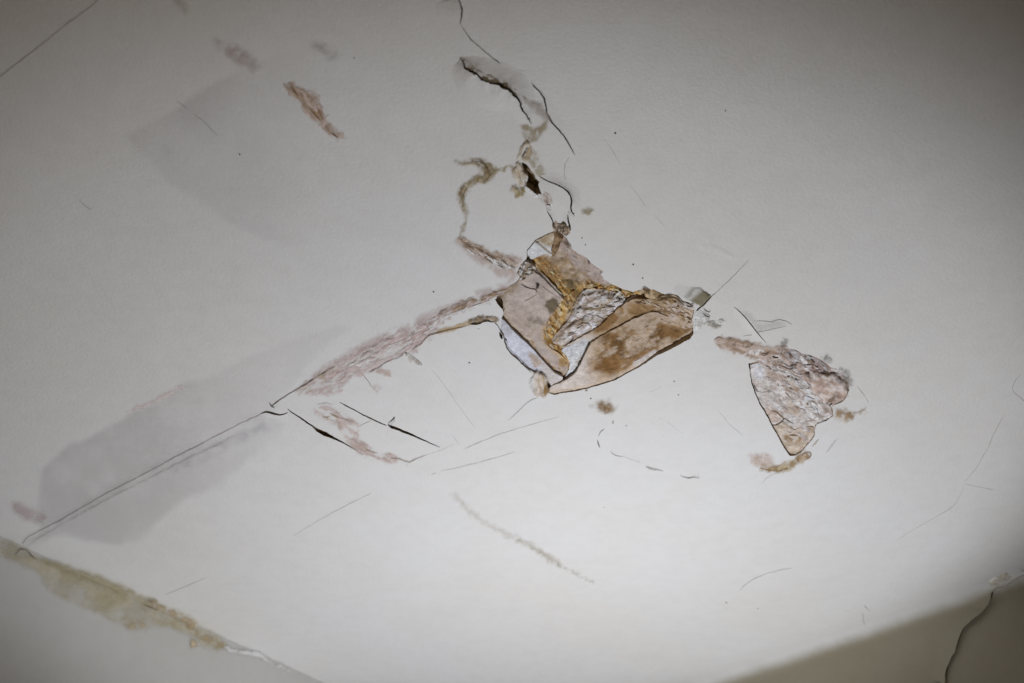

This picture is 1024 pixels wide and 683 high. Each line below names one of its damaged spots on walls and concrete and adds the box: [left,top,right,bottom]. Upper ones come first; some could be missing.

peeling [284,83,343,138]
crack [433,0,580,154]
damp [458,159,507,232]
spalling [272,231,711,406]
crack [24,403,362,541]
crack [385,418,440,453]
spalling [716,337,849,454]
damp [9,546,224,648]
crack [932,566,1024,683]